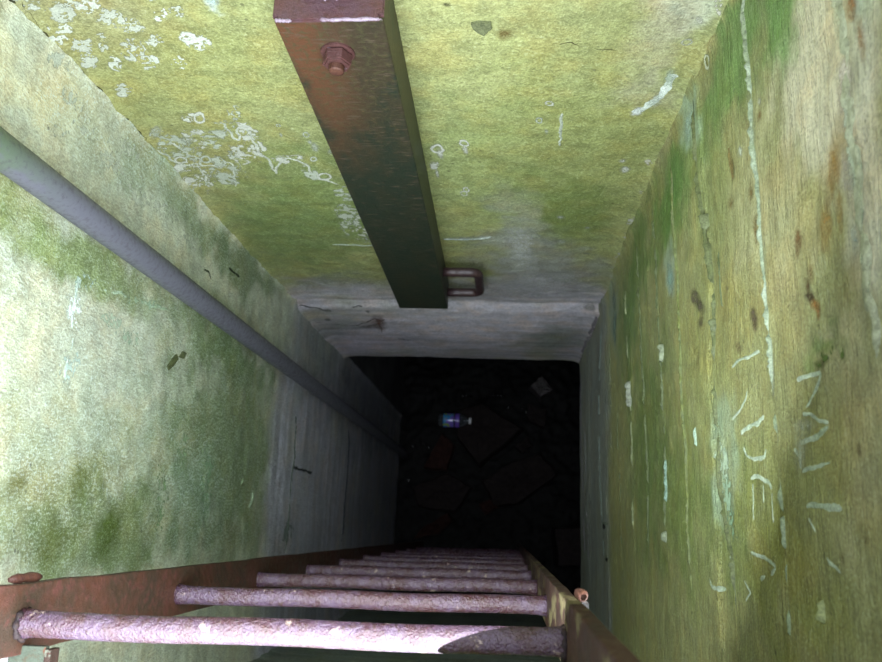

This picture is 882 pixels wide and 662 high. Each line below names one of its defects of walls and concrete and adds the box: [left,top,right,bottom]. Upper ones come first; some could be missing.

peeling [14,0,164,71]
peeling [154,6,183,21]
peeling [179,32,212,51]
peeling [115,83,132,97]
peeling [149,105,367,240]
damp [740,0,774,391]
damp [831,0,882,358]
damp [777,482,786,549]